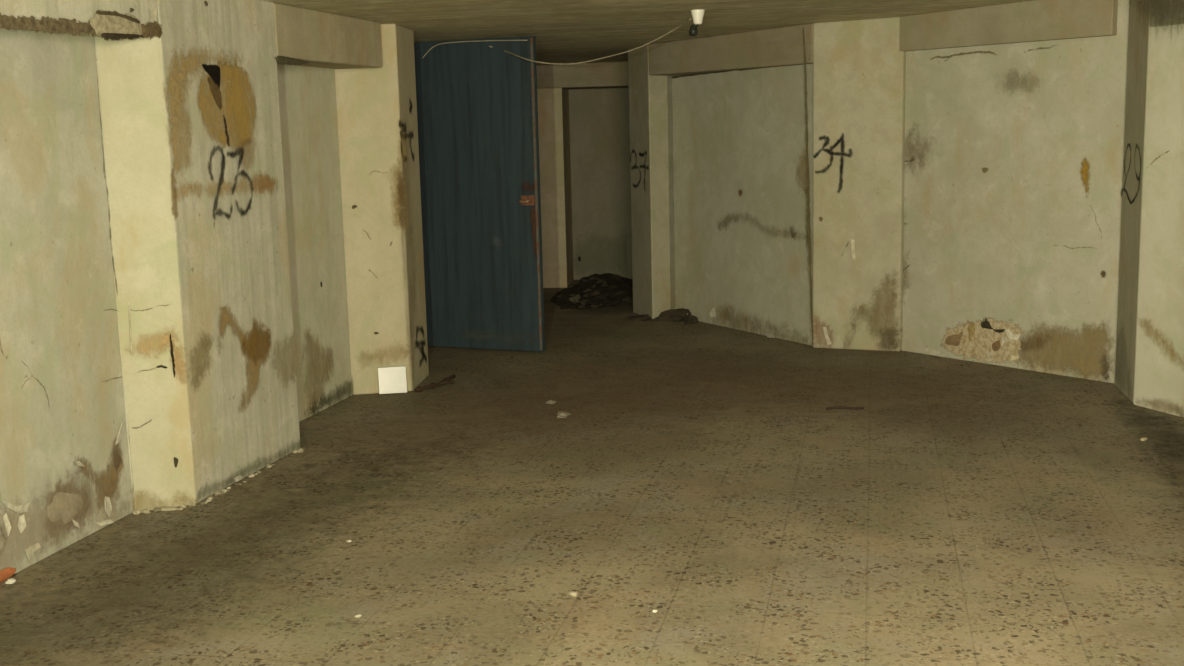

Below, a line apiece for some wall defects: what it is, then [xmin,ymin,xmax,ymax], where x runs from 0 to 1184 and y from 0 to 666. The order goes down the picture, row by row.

spalling [0,8,163,41]
water stain [164,53,237,171]
water stain [191,307,270,408]
spalling [921,316,1023,364]
water stain [1019,324,1110,379]
peeling [96,496,114,526]